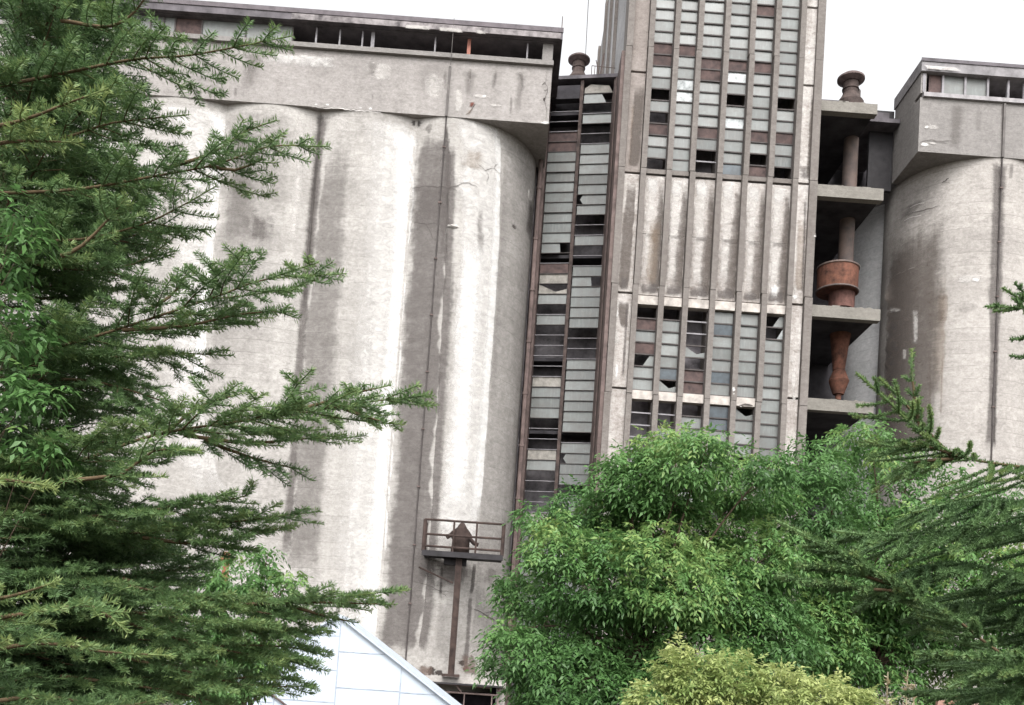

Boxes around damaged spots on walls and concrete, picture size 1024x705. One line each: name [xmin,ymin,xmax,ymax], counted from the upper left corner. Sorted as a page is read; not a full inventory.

damp [284,415,319,550]
damp [295,117,339,399]
damp [382,131,476,665]
damp [619,190,635,288]
damp [642,195,789,301]
damp [881,234,939,451]